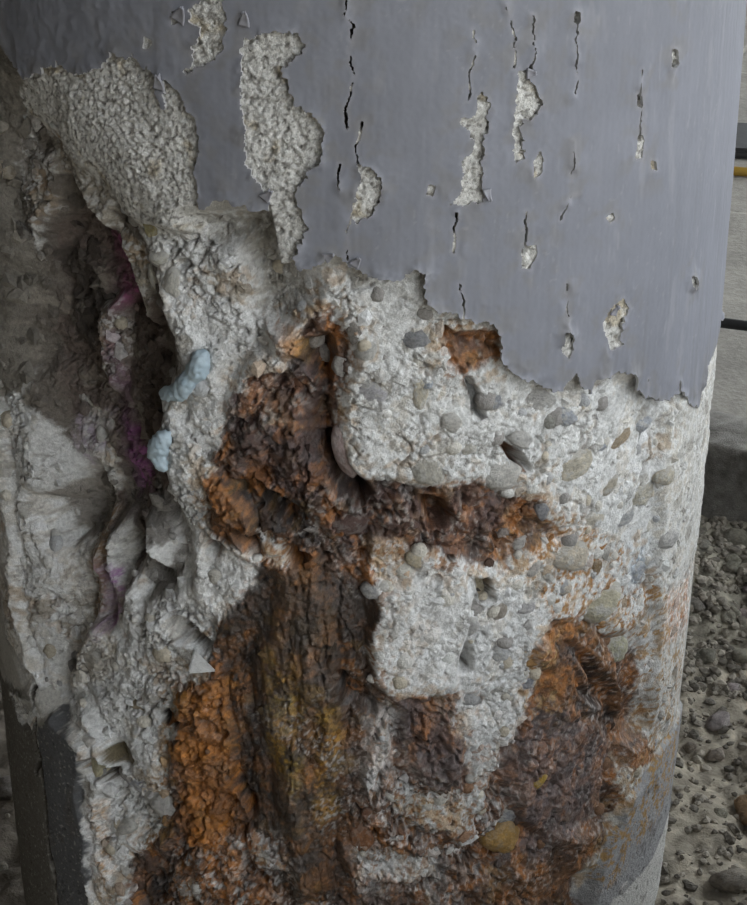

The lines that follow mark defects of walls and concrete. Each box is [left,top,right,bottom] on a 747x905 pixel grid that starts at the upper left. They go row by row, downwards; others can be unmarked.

crack [572,11,580,64]
crack [337,0,364,190]
flaking render [20,56,209,239]
peeling [240,31,325,264]
peeling [450,92,492,205]
crack [451,212,459,252]
crack [521,212,529,253]
rust [442,325,501,374]
rust [203,476,261,551]
rust [512,513,584,566]
spalling [379,580,394,592]
rust [535,612,656,774]